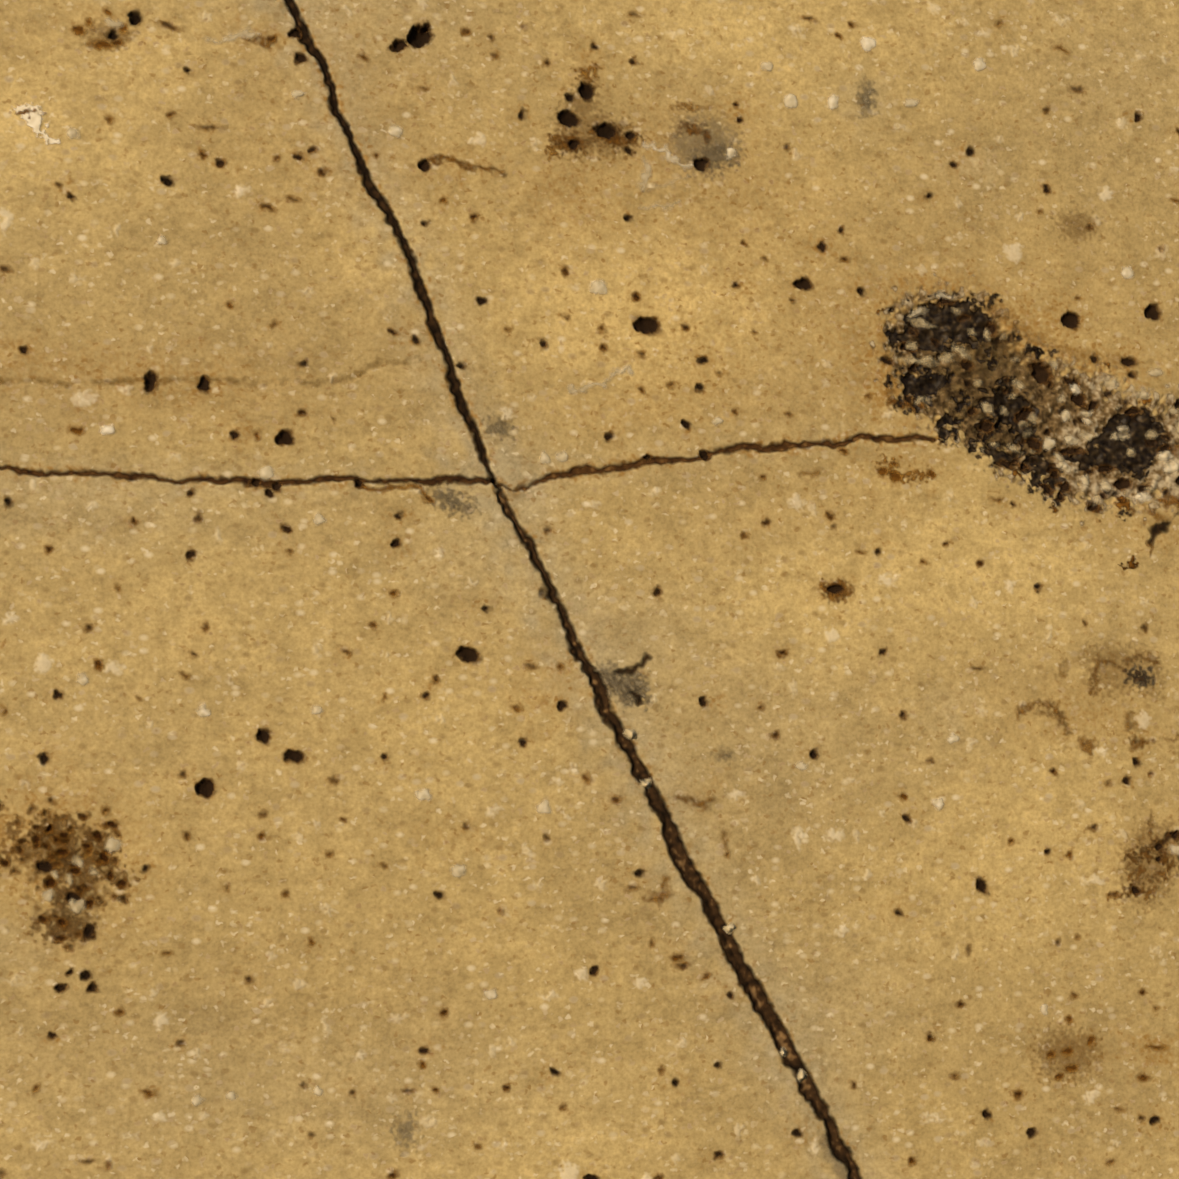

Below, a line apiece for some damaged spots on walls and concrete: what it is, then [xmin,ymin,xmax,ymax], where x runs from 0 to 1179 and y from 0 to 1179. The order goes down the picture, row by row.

spalling [870,274,1179,525]
crack [0,0,936,1179]
rust [1107,831,1179,901]